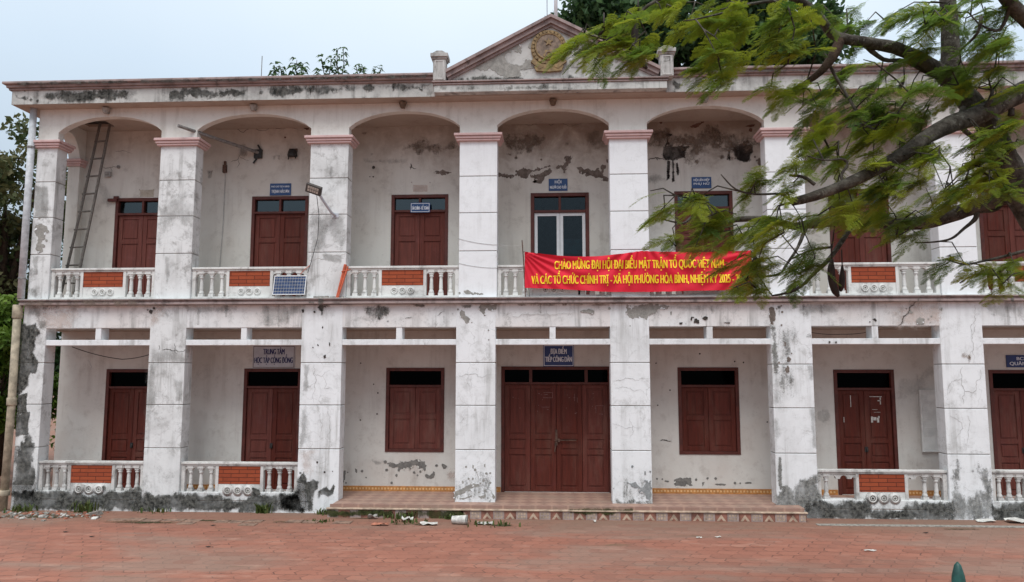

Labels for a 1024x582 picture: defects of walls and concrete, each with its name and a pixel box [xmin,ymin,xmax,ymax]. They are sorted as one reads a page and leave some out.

damp [18,81,128,103]
damp [140,75,426,99]
peeling [498,156,609,184]
peeling [625,303,708,326]
crack [947,308,981,443]
damp [11,290,335,513]
peeling [384,459,447,484]
peeling [627,465,751,499]
damp [774,457,1024,520]